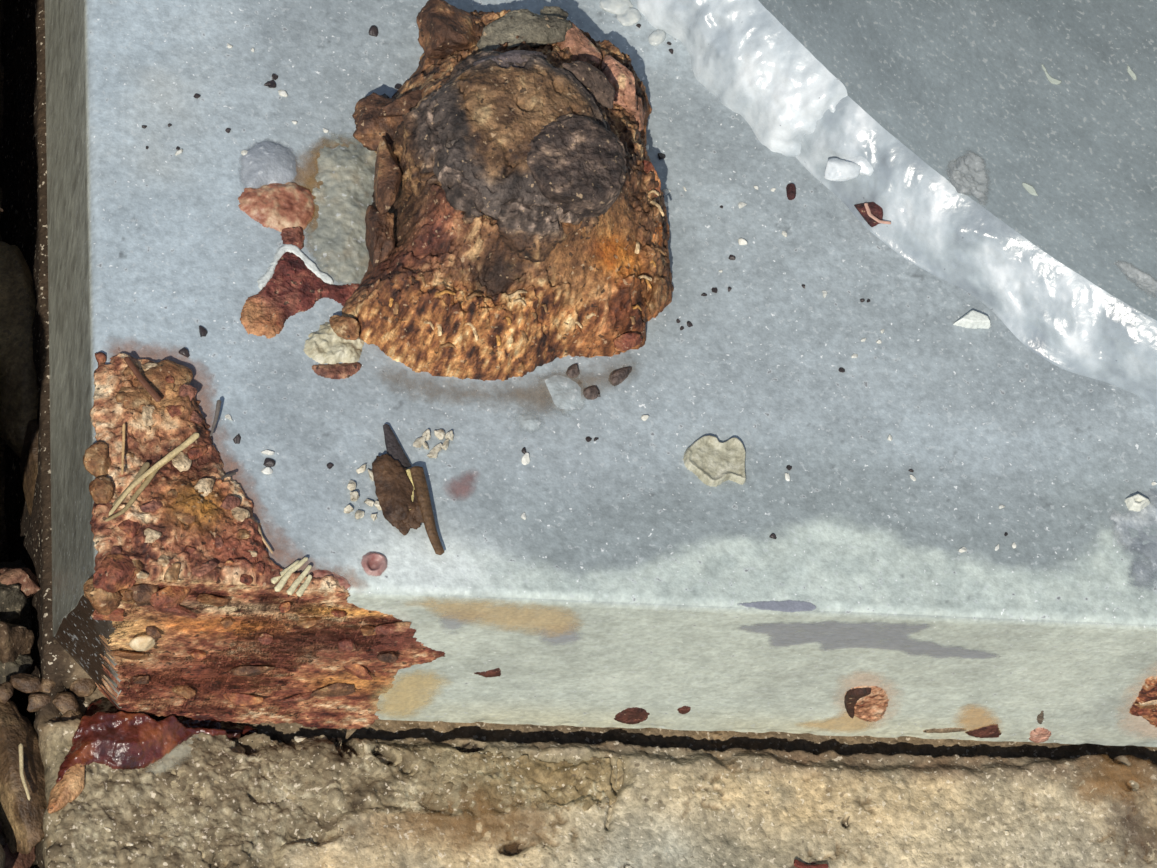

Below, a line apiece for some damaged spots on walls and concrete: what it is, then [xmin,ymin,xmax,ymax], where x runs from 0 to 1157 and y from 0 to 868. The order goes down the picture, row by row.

rust [416,0,645,131]
rust [298,153,323,220]
rust [352,89,423,268]
rust [240,226,360,340]
rust [613,160,668,352]
rust [424,321,457,349]
peeling [953,310,991,329]
rust [510,384,551,407]
rust [566,364,632,400]
rust [47,348,445,814]
rust [849,674,890,703]
rust [1129,676,1157,727]